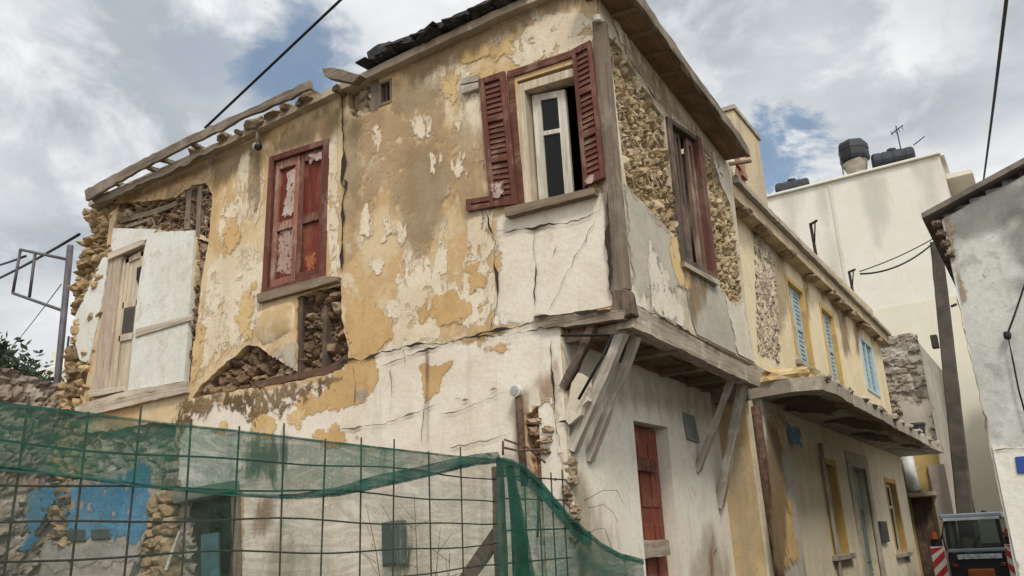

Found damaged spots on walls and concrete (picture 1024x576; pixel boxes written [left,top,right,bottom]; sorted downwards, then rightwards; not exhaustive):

crack [330,96,348,274]
spalling [349,85,372,118]
peeling [114,125,613,576]
crack [335,183,604,449]
peeling [409,8,594,198]
spalling [610,19,798,363]